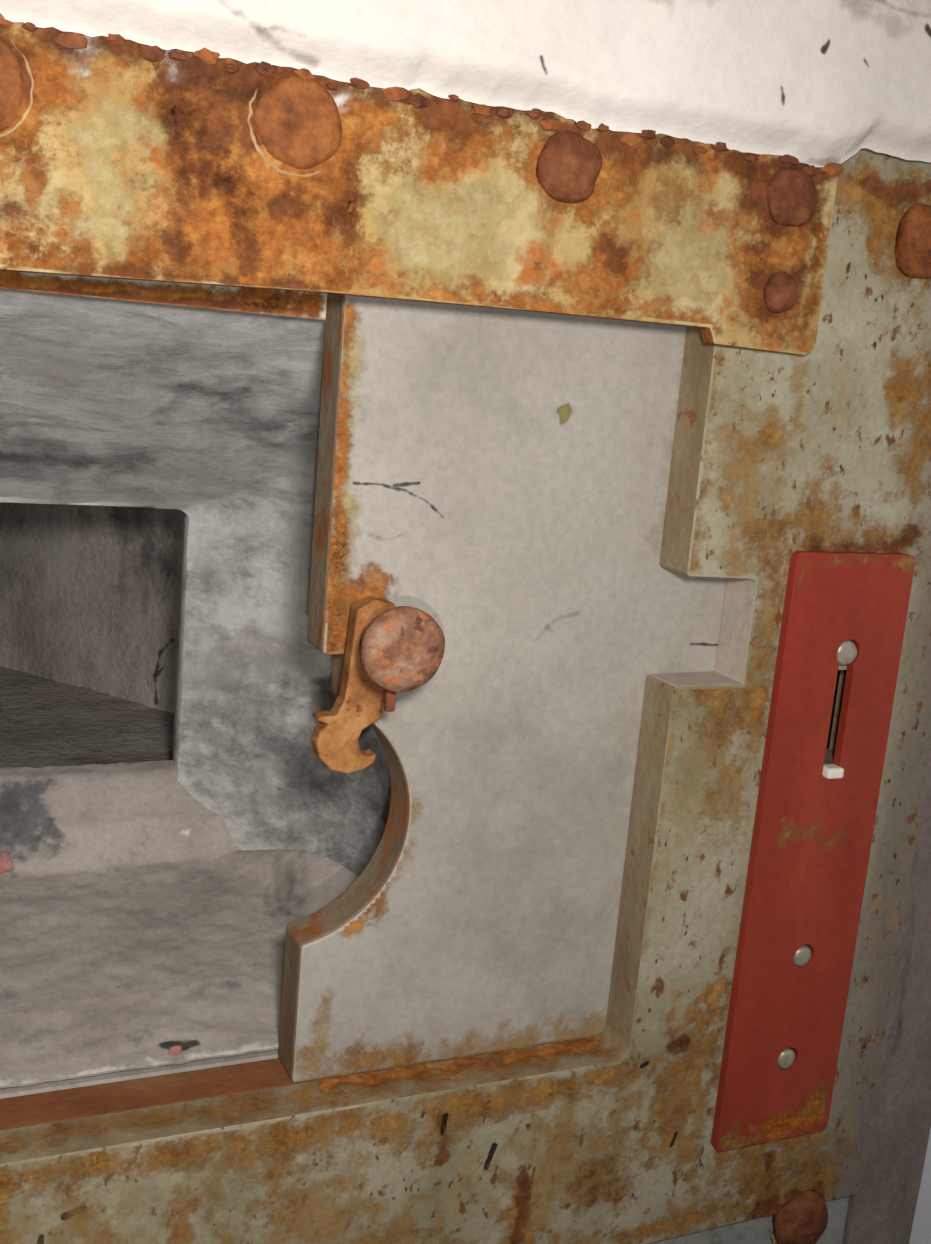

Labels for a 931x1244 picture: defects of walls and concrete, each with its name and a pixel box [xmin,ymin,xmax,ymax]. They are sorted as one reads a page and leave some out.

rust [0,30,721,336]
rust [652,150,931,353]
rust [885,351,931,503]
rust [335,564,392,654]
rust [696,408,925,814]
rust [344,882,389,935]
rust [0,977,854,1244]